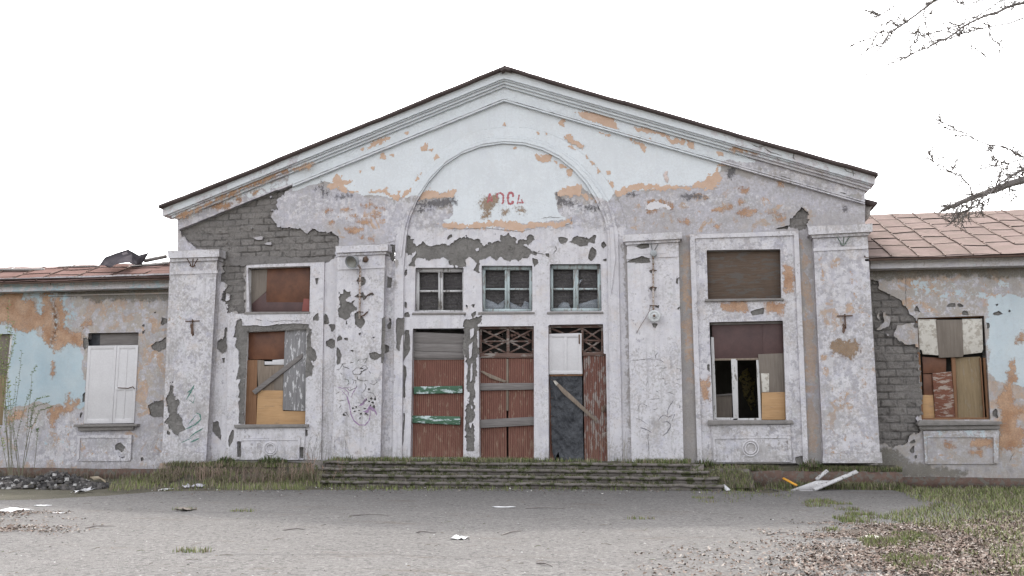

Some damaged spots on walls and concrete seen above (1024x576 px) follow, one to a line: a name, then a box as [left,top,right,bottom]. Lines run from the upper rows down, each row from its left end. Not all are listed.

peeling [558,111,725,210]
flaking render [390,195,607,275]
flaking render [778,208,809,231]
flaking render [152,338,166,351]
flaking render [149,385,185,435]
flaking render [182,187,410,457]
flaking render [462,304,482,451]
flaking render [870,280,923,458]